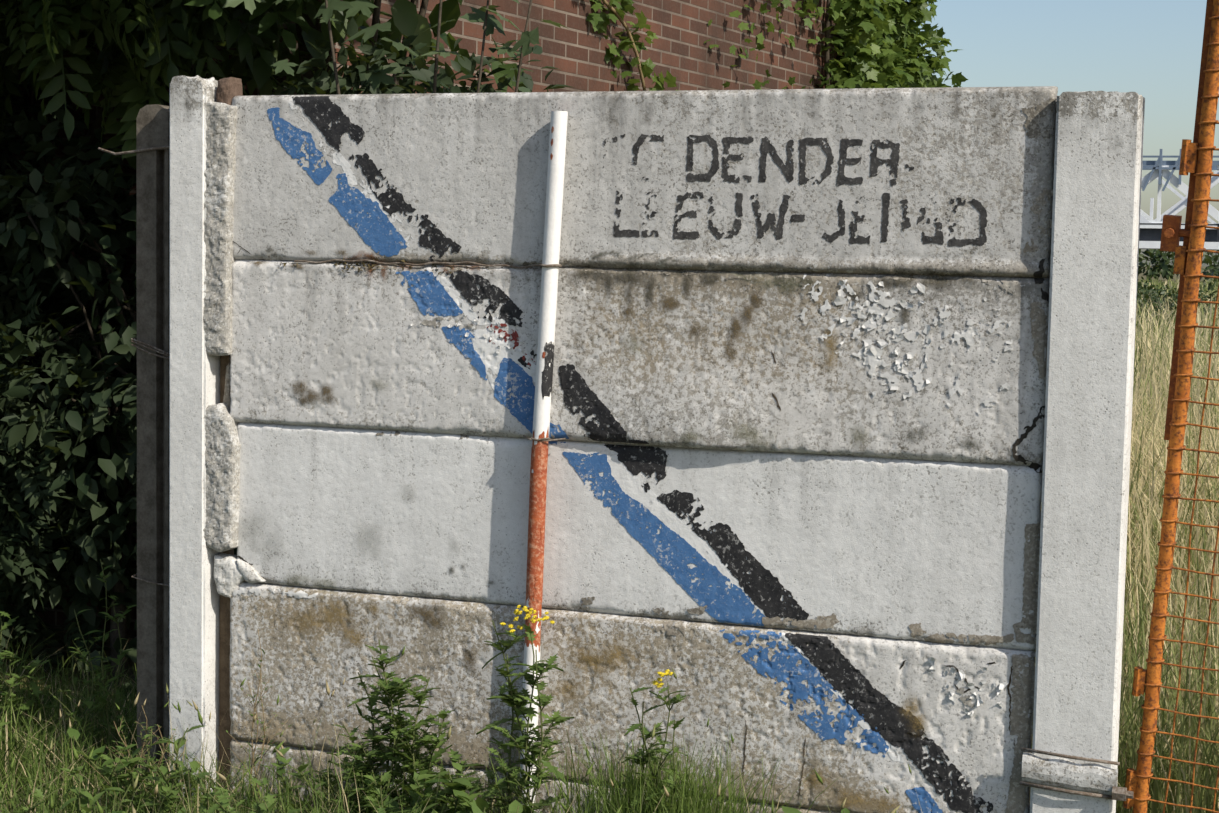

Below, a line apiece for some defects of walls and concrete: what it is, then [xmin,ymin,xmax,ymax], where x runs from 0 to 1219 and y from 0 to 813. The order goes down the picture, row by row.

damp [578,251,725,316]
spalling [1023,188,1053,379]
damp [726,292,761,358]
peeling [726,271,1018,399]
damp [293,382,333,404]
peeling [946,362,1011,415]
crack [1012,406,1045,473]
rust [526,446,549,603]
spalling [214,553,318,599]
spalling [909,523,1041,813]